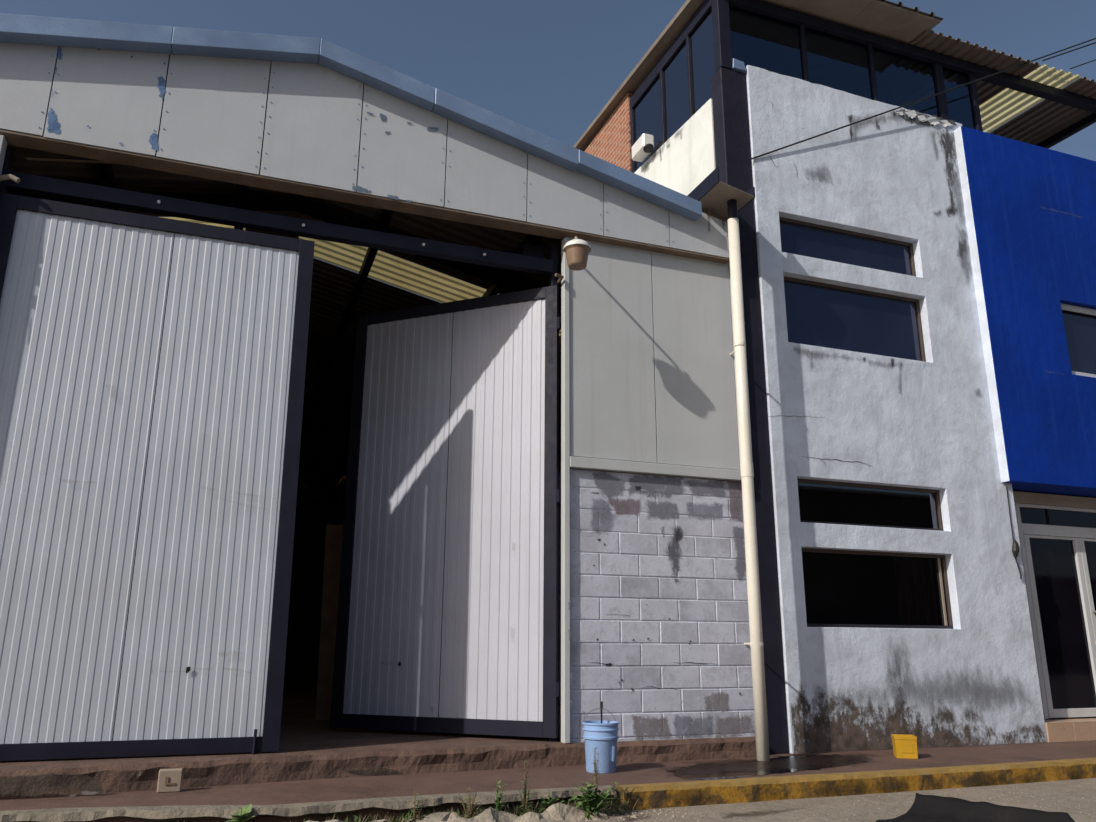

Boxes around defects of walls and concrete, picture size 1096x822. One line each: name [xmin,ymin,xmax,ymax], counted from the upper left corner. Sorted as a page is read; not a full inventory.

peeling [158,62,166,101]
peeling [47,89,60,134]
peeling [149,132,158,151]
water stain [933,130,963,216]
water stain [959,232,970,273]
water stain [662,527,683,581]
water stain [675,654,1045,775]